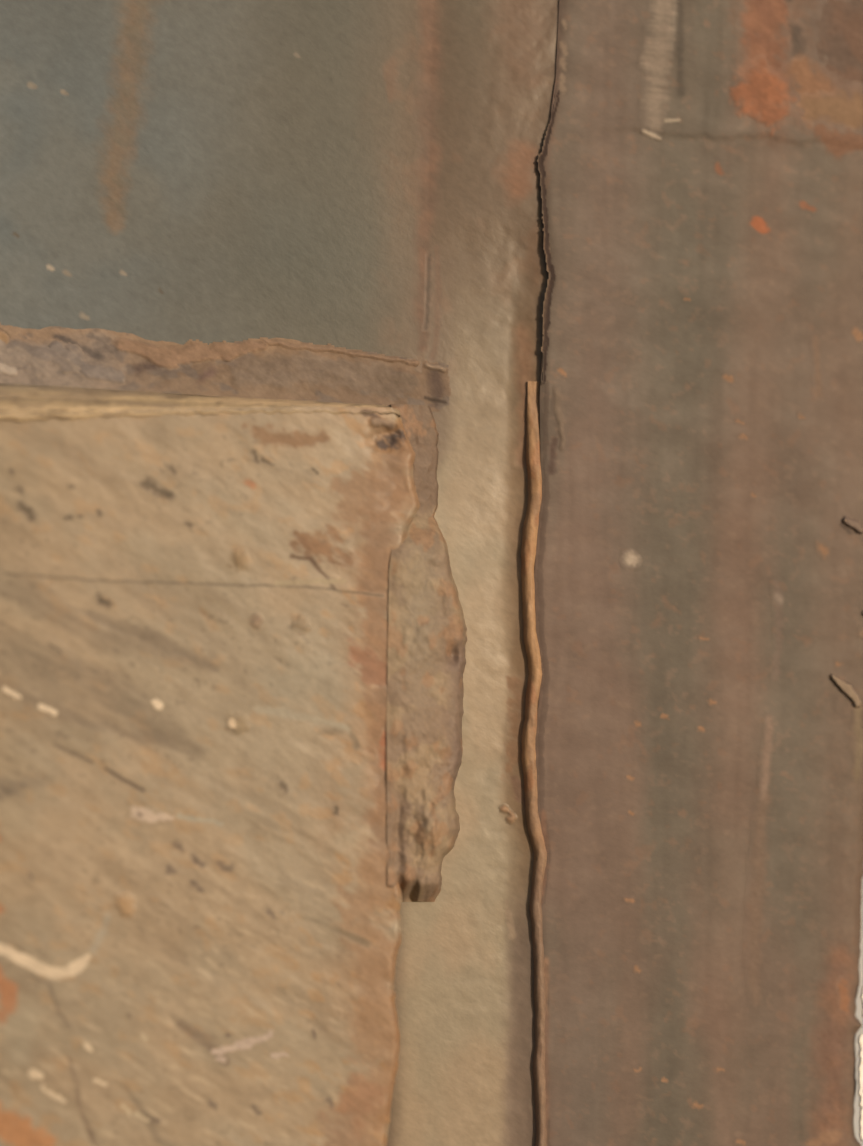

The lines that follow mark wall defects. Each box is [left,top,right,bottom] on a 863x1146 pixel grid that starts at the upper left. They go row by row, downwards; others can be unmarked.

rust [716,0,863,164]
crack [536,90,561,906]